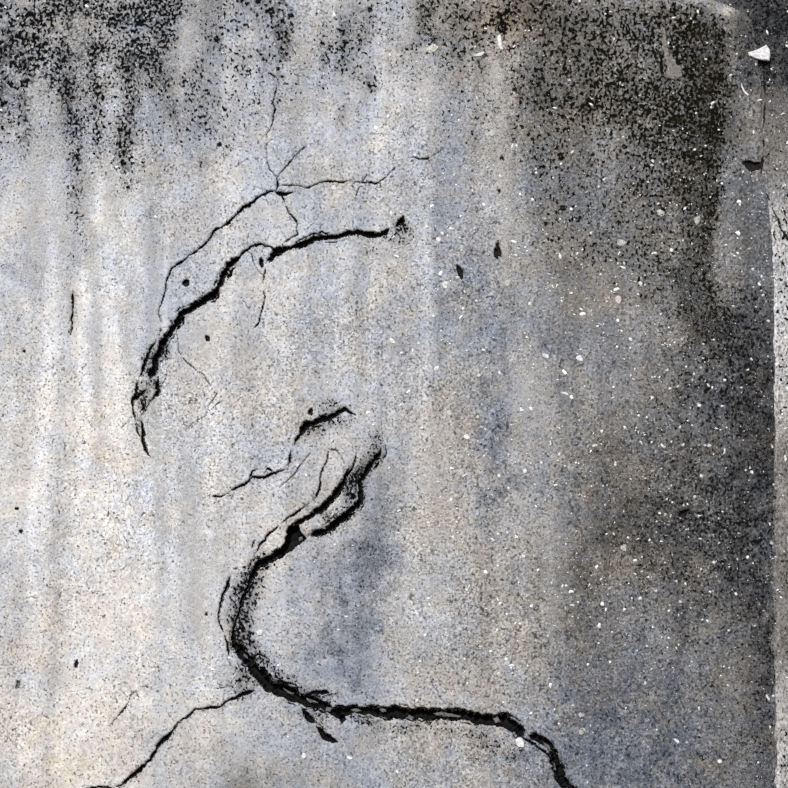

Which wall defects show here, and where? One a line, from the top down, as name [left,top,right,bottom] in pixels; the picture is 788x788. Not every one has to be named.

damp [0,19,182,267]
crack [121,73,441,455]
damp [272,31,291,83]
damp [301,24,334,89]
damp [557,16,777,788]
crack [90,407,578,788]